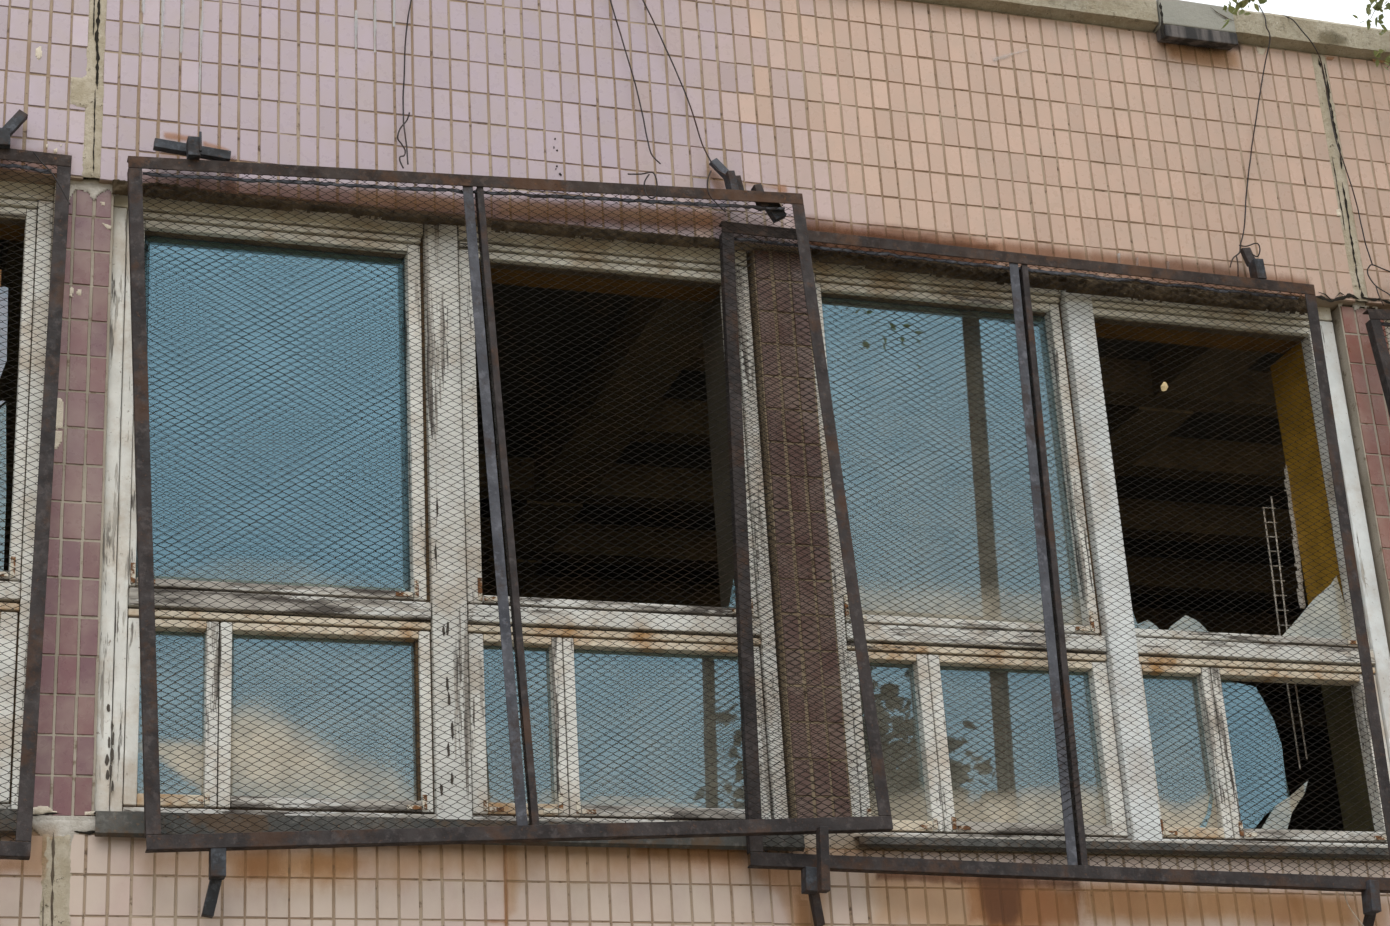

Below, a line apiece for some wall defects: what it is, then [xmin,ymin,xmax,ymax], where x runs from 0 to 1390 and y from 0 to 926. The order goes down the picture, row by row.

crack [92,0,100,171]
crack [1316,58,1390,304]
peeling [105,704,114,793]